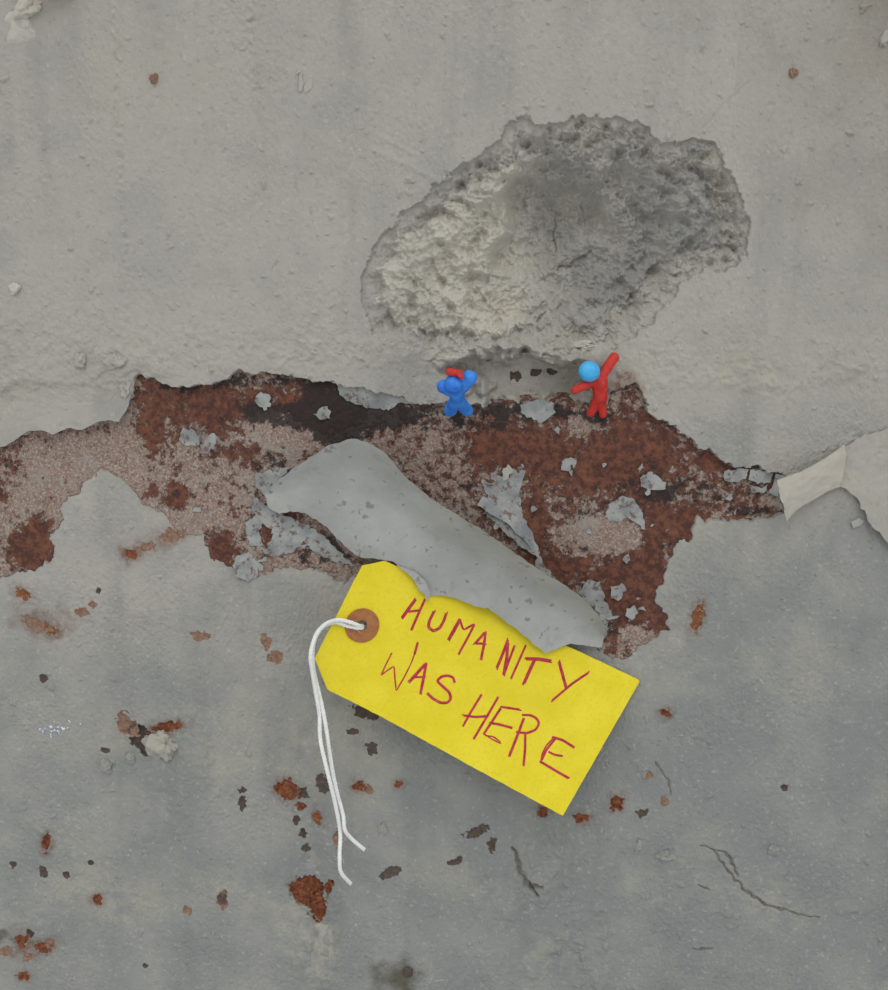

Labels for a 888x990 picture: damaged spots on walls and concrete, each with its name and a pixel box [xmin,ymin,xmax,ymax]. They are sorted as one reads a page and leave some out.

rust [0,369,786,660]
spalling [137,527,184,552]
peeling [264,439,606,653]
spalling [190,631,211,642]
spalling [260,633,283,665]
rust [147,720,182,735]
rust [273,777,322,825]
rust [289,875,334,923]
crack [700,845,820,918]
rust [15,933,54,953]